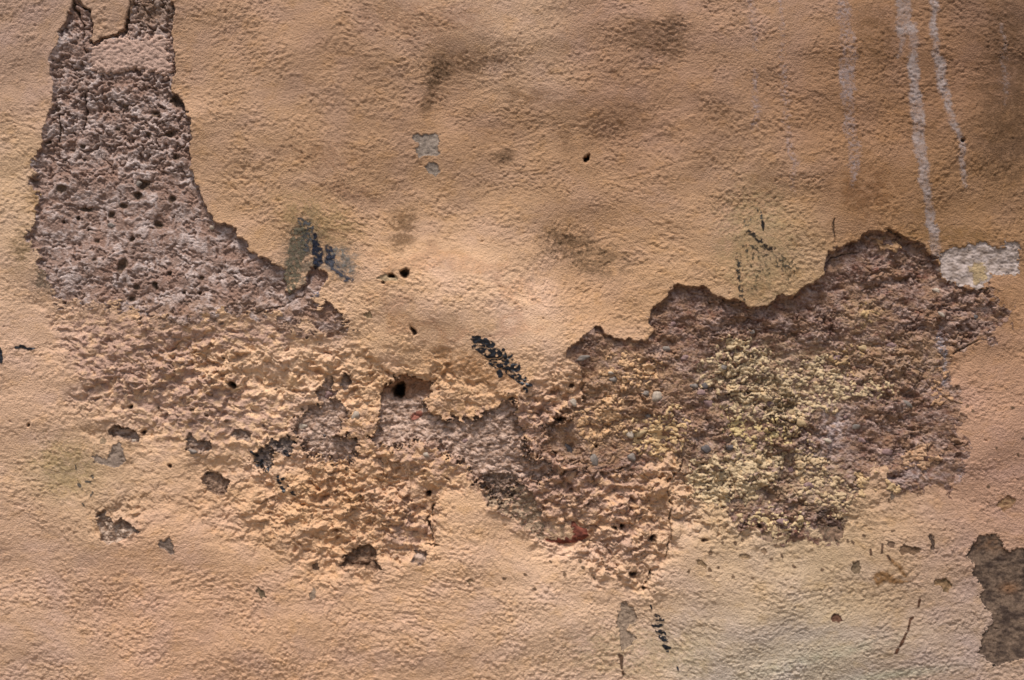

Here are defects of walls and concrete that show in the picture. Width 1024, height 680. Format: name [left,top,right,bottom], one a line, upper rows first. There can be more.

water stain [897,0,939,40]
water stain [934,54,952,111]
water stain [907,52,931,197]
spalling [24,0,359,353]
water stain [925,210,939,237]
spalling [230,231,1016,560]
peeling [91,425,140,468]
spalling [185,432,212,454]
spalling [202,472,230,495]
spalling [96,510,140,545]
spalling [341,544,382,572]
peeling [966,534,1024,666]